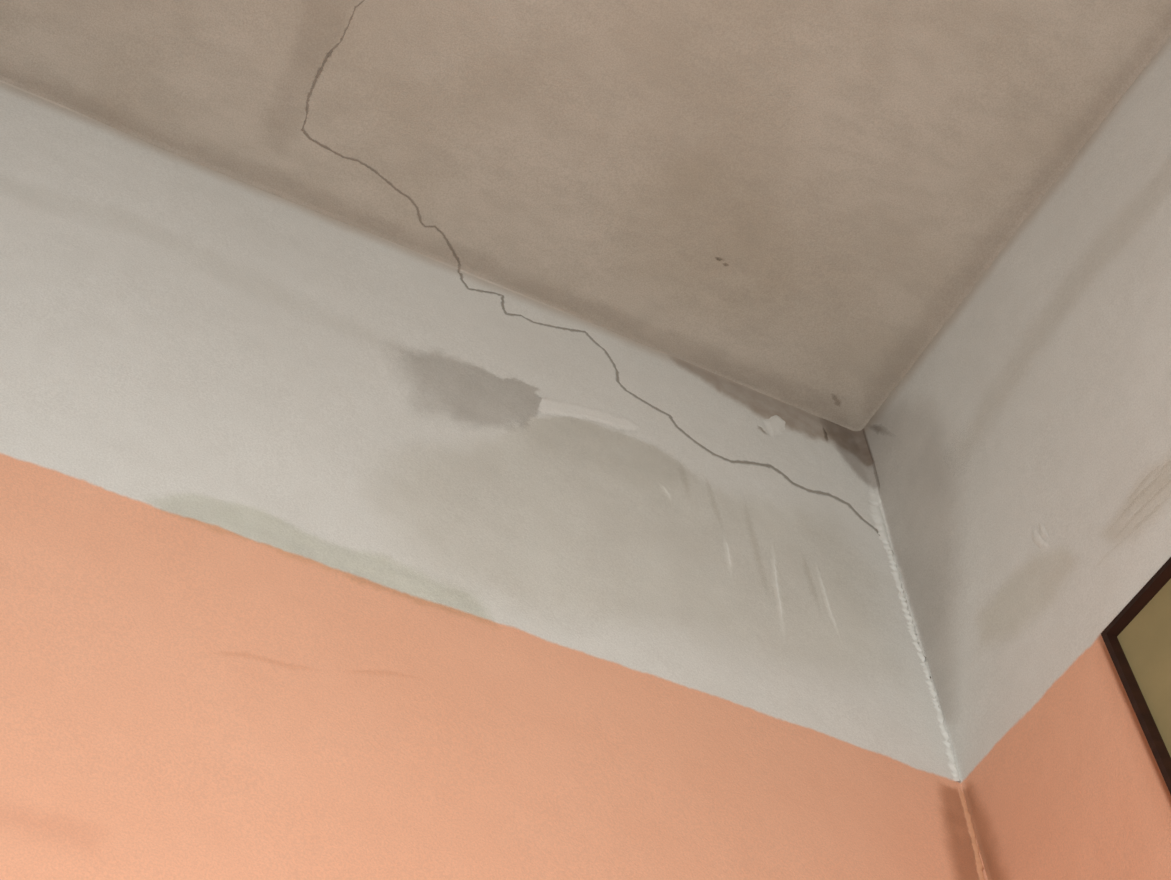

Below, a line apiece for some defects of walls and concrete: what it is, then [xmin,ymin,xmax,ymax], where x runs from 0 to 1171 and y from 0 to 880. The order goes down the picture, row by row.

water stain [534,396,643,432]
crack [302,1,878,533]